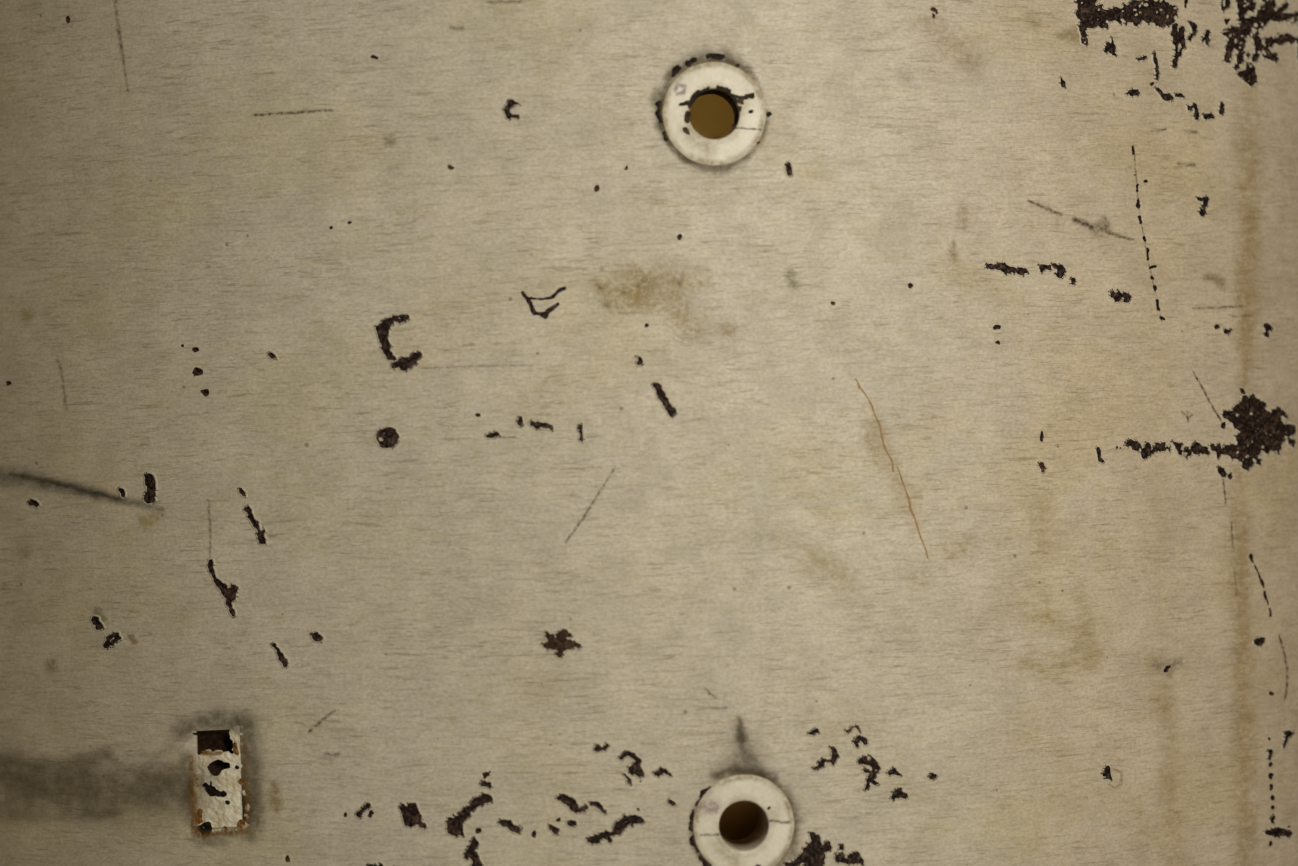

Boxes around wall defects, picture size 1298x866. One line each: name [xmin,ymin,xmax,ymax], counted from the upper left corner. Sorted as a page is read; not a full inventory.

corrosion [672,53,740,77]
corrosion [655,100,669,141]
corrosion [190,742,249,837]
corrosion [689,786,712,866]